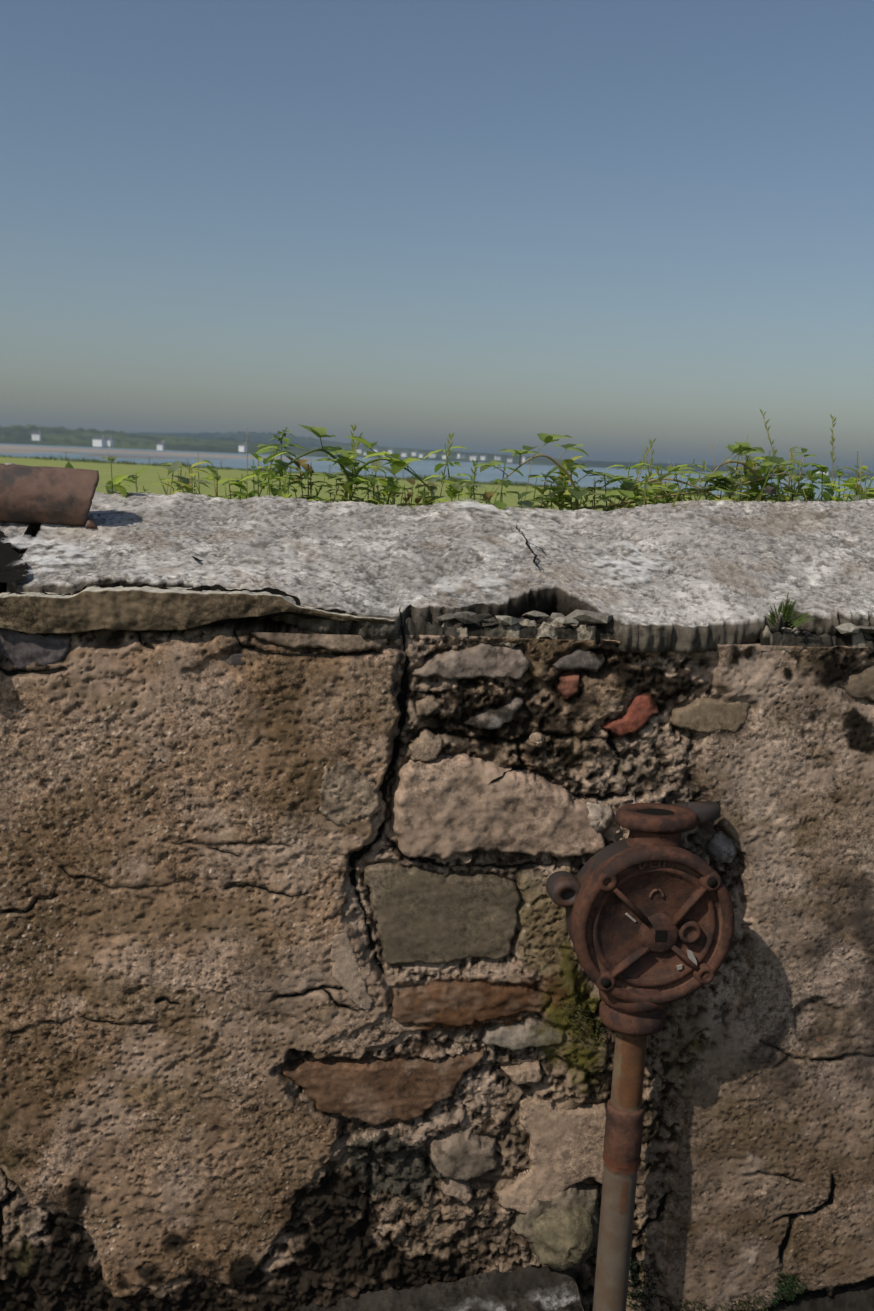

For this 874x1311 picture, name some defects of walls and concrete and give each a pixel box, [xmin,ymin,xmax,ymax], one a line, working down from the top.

spalling [398,609,616,648]
spalling [760,623,874,655]
crack [0,524,629,980]
peeling [408,694,443,761]
crack [6,998,179,1047]
crack [275,986,359,1013]
leakage [818,877,874,1081]
spalling [347,1130,473,1204]
peeling [497,1060,607,1214]
crack [0,1168,38,1309]
leakage [0,1171,481,1311]
crack [744,1171,836,1270]